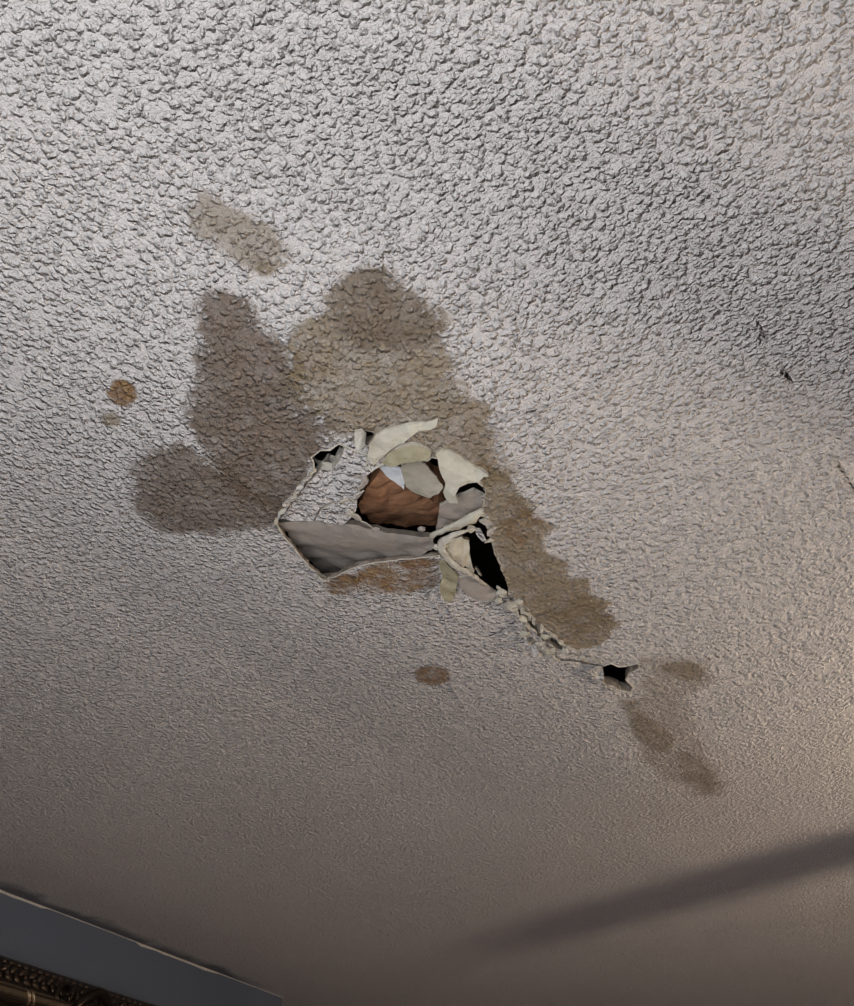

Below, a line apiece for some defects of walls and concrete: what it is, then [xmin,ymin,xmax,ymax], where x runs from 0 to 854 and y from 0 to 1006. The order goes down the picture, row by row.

peeling [274,468,317,525]
peeling [354,428,366,451]
water stain [132,271,620,649]
peeling [340,442,496,543]
crack [494,585,603,666]